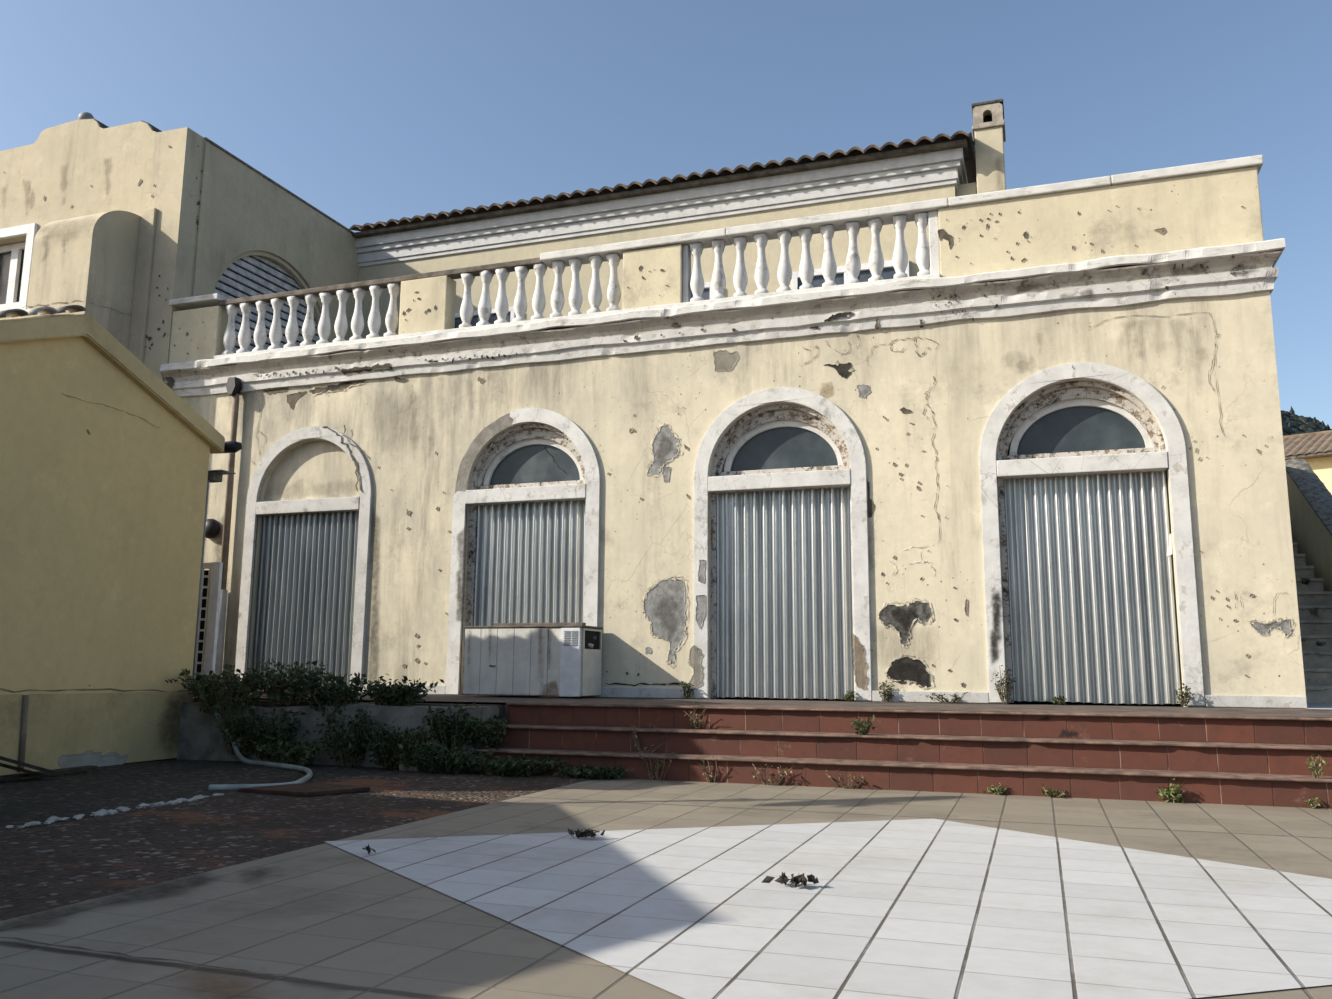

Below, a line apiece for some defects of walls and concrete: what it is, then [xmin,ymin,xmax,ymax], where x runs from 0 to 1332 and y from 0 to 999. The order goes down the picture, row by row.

flaking render [713,350,739,372]
crack [62,393,160,428]
peeling [645,407,689,482]
crack [801,335,940,575]
peeling [640,560,706,689]
peeling [851,634,869,690]
spalling [877,598,951,689]
peeling [1210,590,1294,637]